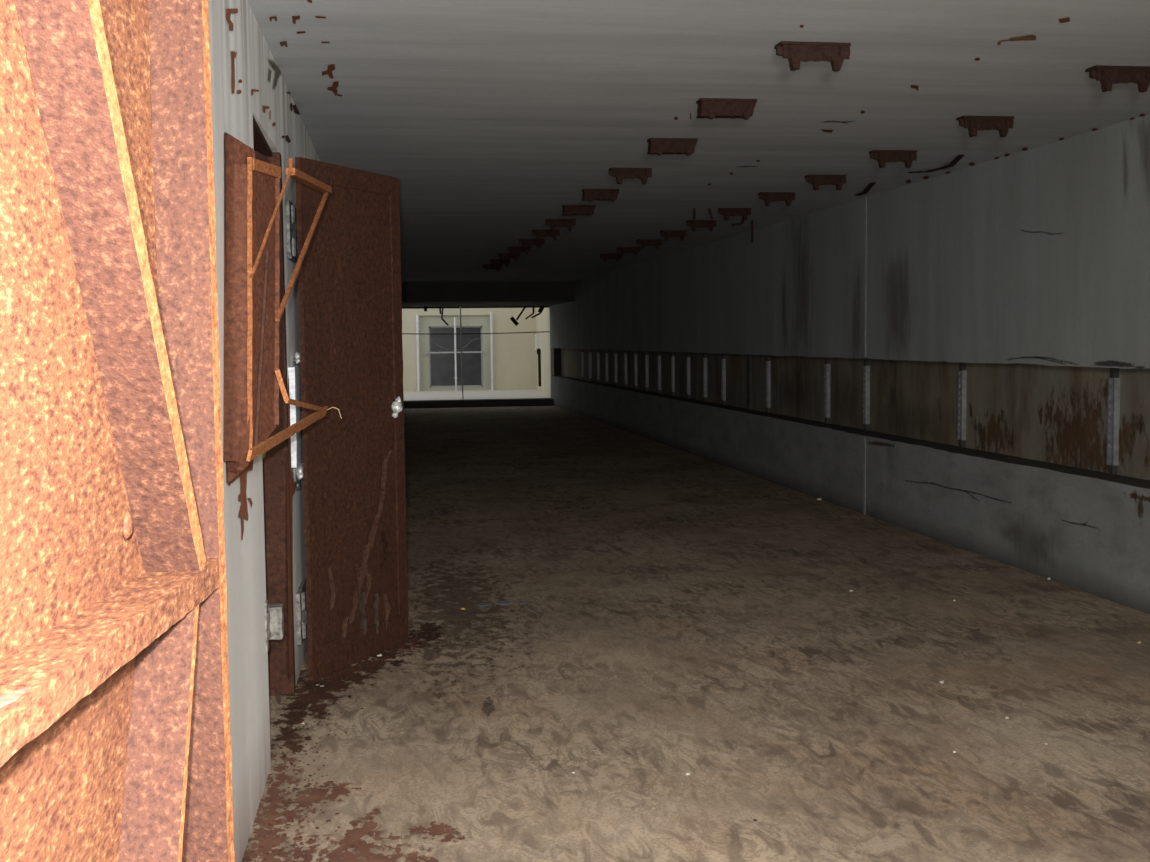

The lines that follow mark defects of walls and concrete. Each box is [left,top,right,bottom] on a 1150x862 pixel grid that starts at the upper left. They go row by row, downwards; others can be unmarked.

rust [226,8,238,31]
rust [230,51,259,95]
rust [322,64,342,97]
rust [1038,382,1144,473]
rust [228,461,253,540]
crack [906,480,1010,503]
rust [1130,491,1150,517]
rust [123,510,134,541]
rust [242,383,466,862]